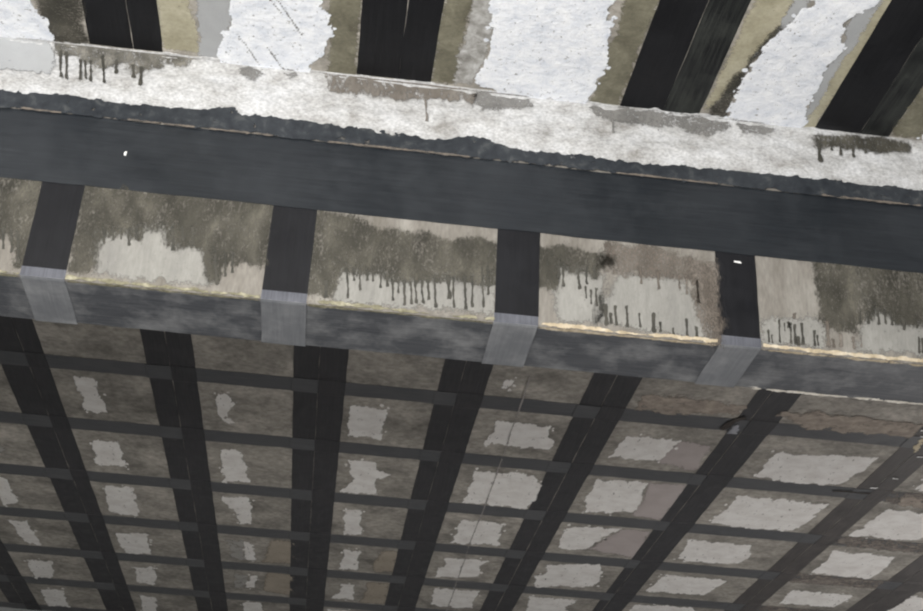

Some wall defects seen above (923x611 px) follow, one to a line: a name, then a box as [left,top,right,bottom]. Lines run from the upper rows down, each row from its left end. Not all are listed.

peeling [0,0,54,41]
damp [53,42,196,85]
peeling [216,0,337,73]
peeling [475,0,618,104]
peeling [723,0,880,128]
damp [0,89,923,207]
damp [68,186,273,285]
damp [308,210,497,310]
damp [539,241,718,335]
damp [767,262,923,353]